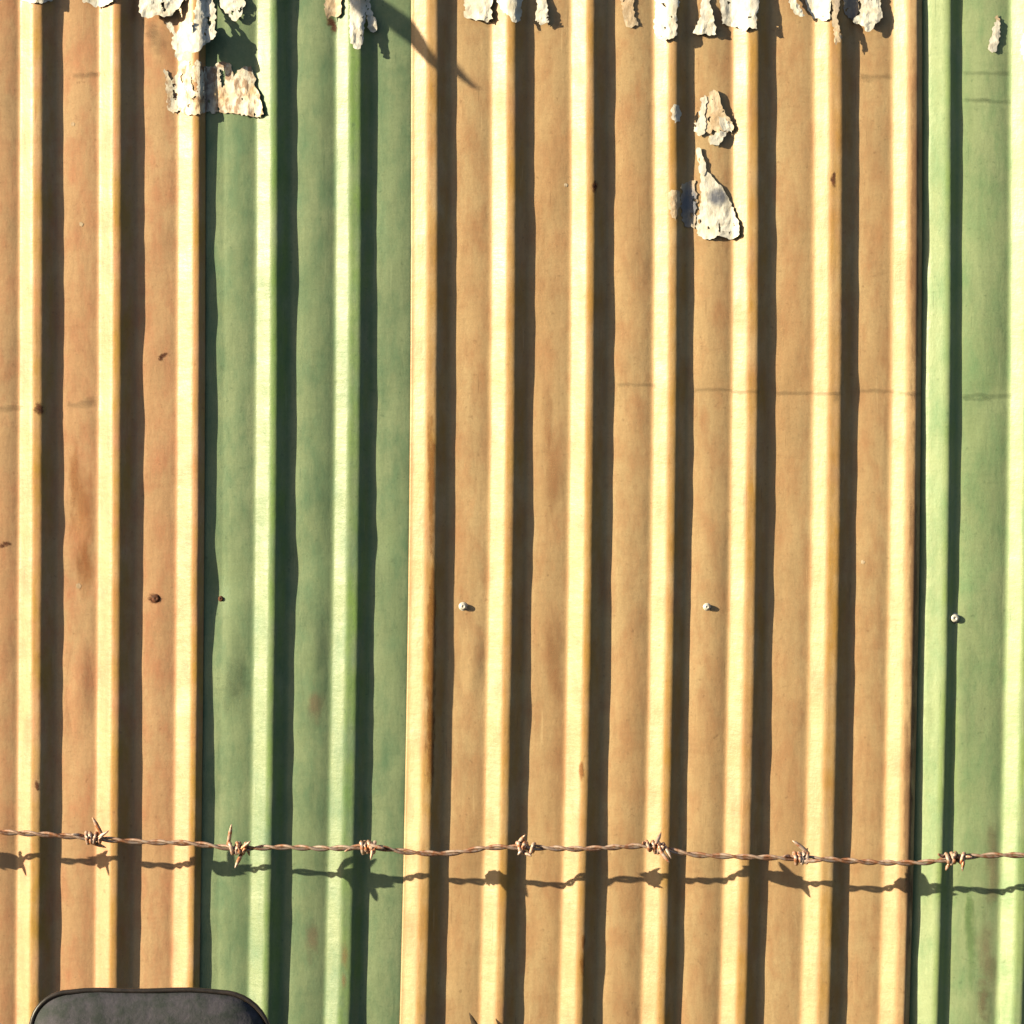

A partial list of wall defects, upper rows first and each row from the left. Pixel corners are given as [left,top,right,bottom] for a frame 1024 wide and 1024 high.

peeling [324,0,377,49]
peeling [464,0,523,23]
peeling [535,0,549,25]
peeling [620,0,638,28]
peeling [653,0,680,41]
peeling [693,0,759,36]
peeling [789,0,883,45]
peeling [988,15,1001,53]
peeling [138,0,264,117]
peeling [667,89,739,240]